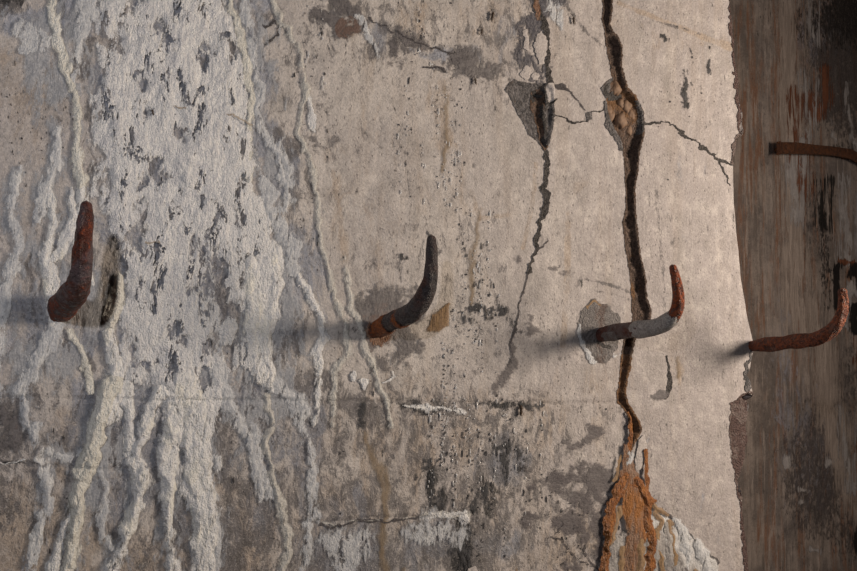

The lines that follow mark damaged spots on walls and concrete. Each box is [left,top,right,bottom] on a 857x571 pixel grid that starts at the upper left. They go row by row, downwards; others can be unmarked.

crack [369,17,455,73]
spalling [505,0,569,151]
damp [0,0,630,571]
crack [492,150,575,394]
crack [533,0,733,453]
damp [627,311,680,339]
damp [768,0,857,335]
crack [319,510,471,530]
corrosion [599,411,657,571]
damp [644,504,719,571]
damp [804,339,857,530]